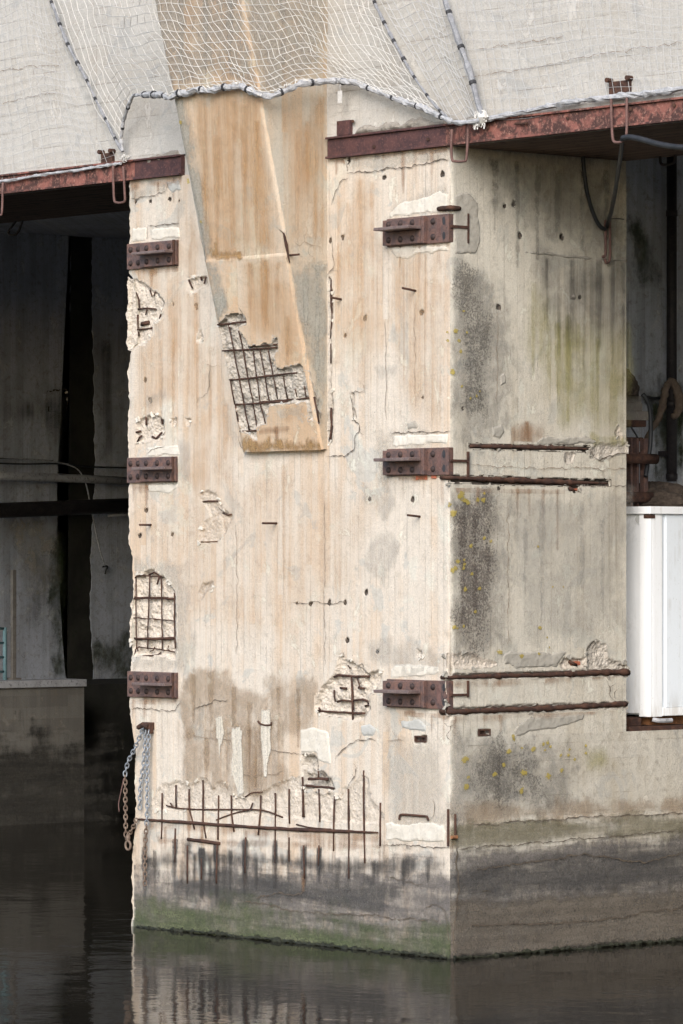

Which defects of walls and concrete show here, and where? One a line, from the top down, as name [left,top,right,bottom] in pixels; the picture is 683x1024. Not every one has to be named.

corrosion [209,236,243,260]
spalling [126,277,174,351]
spalling [216,275,347,446]
crack [329,391,360,457]
water stain [458,509,490,623]
spalling [129,568,178,660]
spalling [313,637,384,723]
water stain [216,709,271,795]
corrosion [138,791,378,840]
spalling [148,753,384,883]
water stain [134,831,683,959]
crack [245,812,683,954]